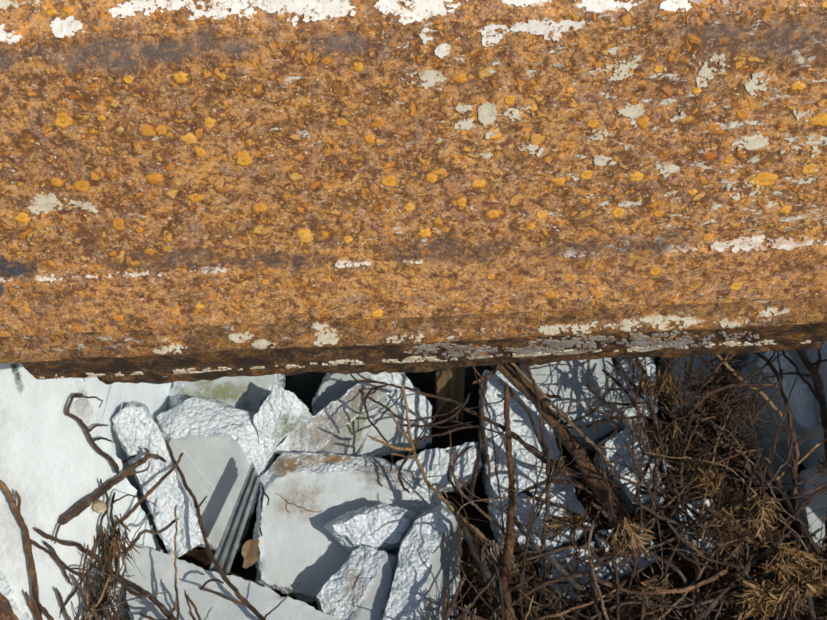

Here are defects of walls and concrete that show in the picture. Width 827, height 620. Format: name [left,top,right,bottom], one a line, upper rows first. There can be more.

peeling [49,16,85,38]
peeling [108,0,356,27]
peeling [374,0,468,58]
peeling [477,0,639,47]
corrosion [173,71,189,84]
corrosion [180,132,208,158]
corrosion [49,176,90,193]
corrosion [629,171,645,182]
corrosion [747,171,779,187]
corrosion [296,228,315,244]
peeling [661,234,827,253]
peeling [382,307,790,363]